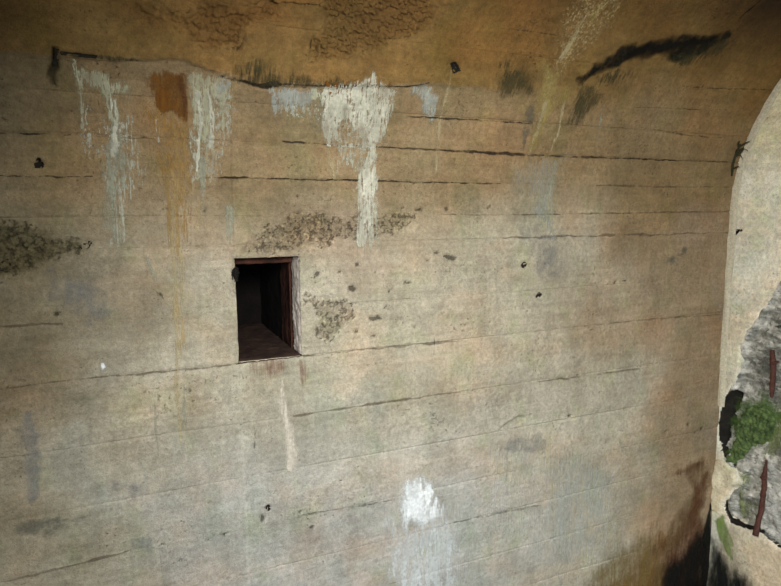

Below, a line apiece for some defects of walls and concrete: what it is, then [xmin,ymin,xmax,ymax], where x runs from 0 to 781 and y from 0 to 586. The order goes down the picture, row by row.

damp [71,54,146,248]
rust [142,71,194,255]
damp [189,73,237,186]
damp [241,61,395,247]
spalling [309,0,437,65]
damp [413,86,447,139]
damp [502,0,731,149]
spalling [724,281,781,545]
damp [393,478,452,586]
damp [597,503,747,586]